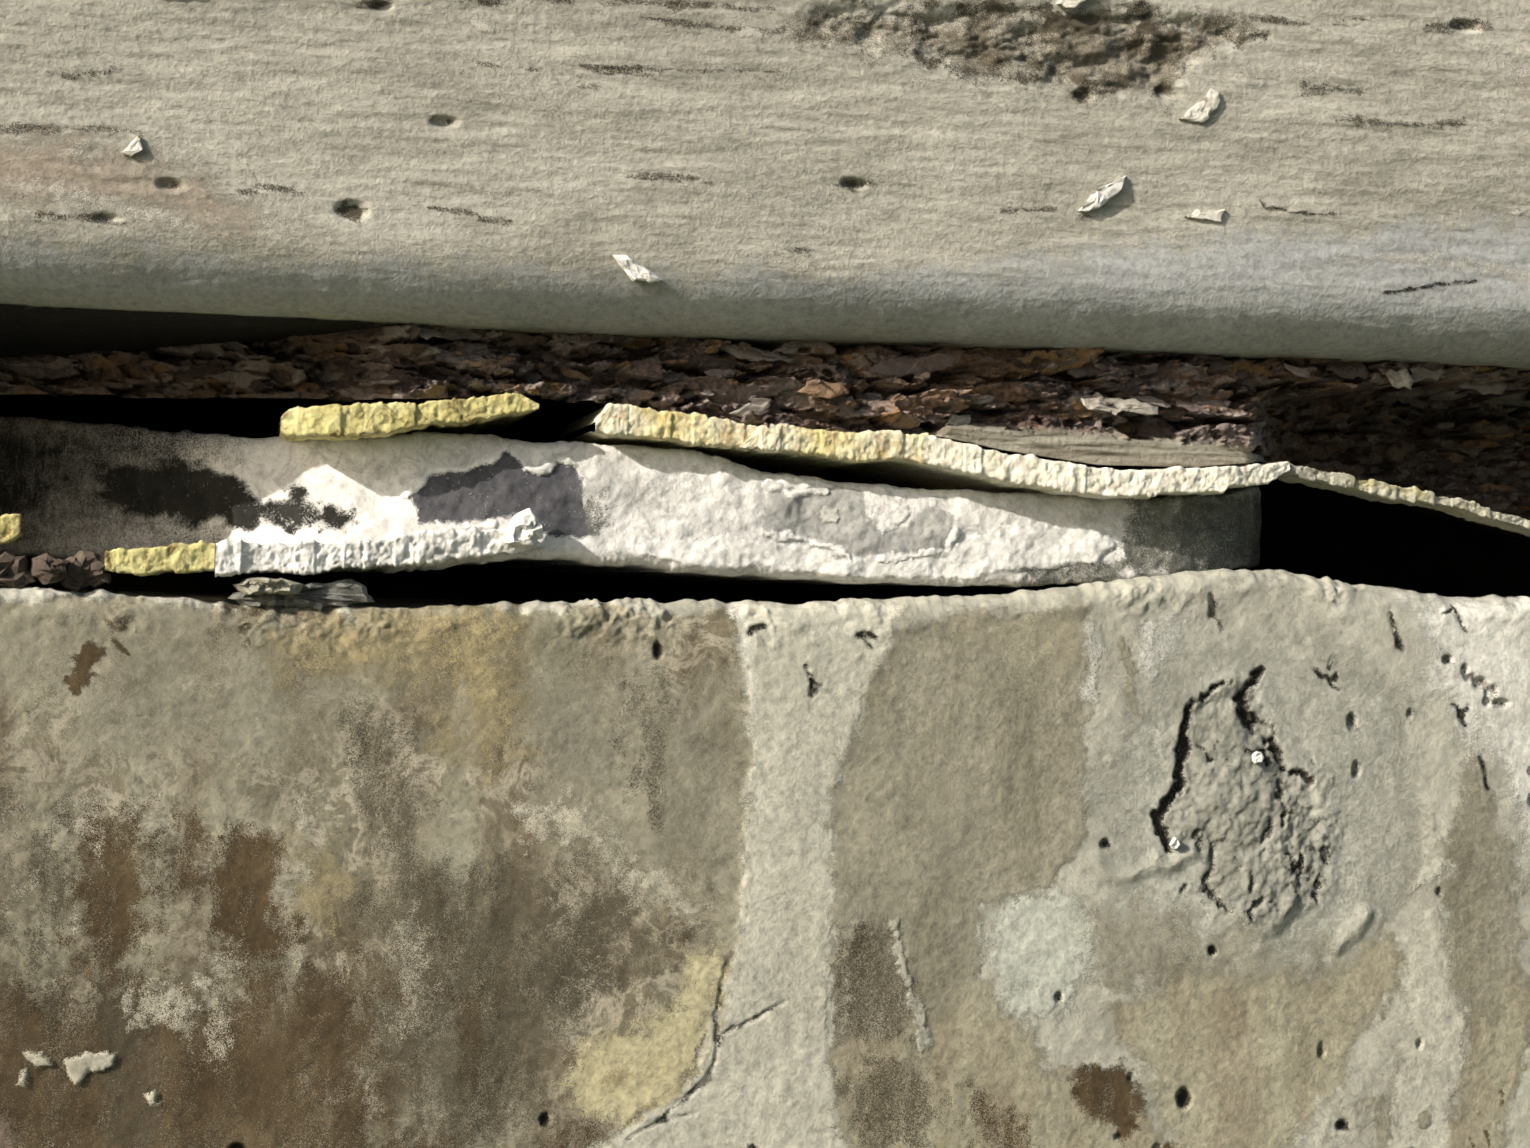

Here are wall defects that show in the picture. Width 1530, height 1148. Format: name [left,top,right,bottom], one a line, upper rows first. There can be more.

damp [577,0,1369,115]
damp [1326,114,1466,131]
damp [2,177,184,230]
corrosion [729,398,771,417]
corrosion [797,379,859,412]
corrosion [868,353,956,377]
corrosion [1067,359,1231,429]
corrosion [1282,361,1507,397]
damp [0,416,359,565]
damp [1011,487,1261,588]
crack [1313,657,1341,691]
damp [0,587,1530,1148]